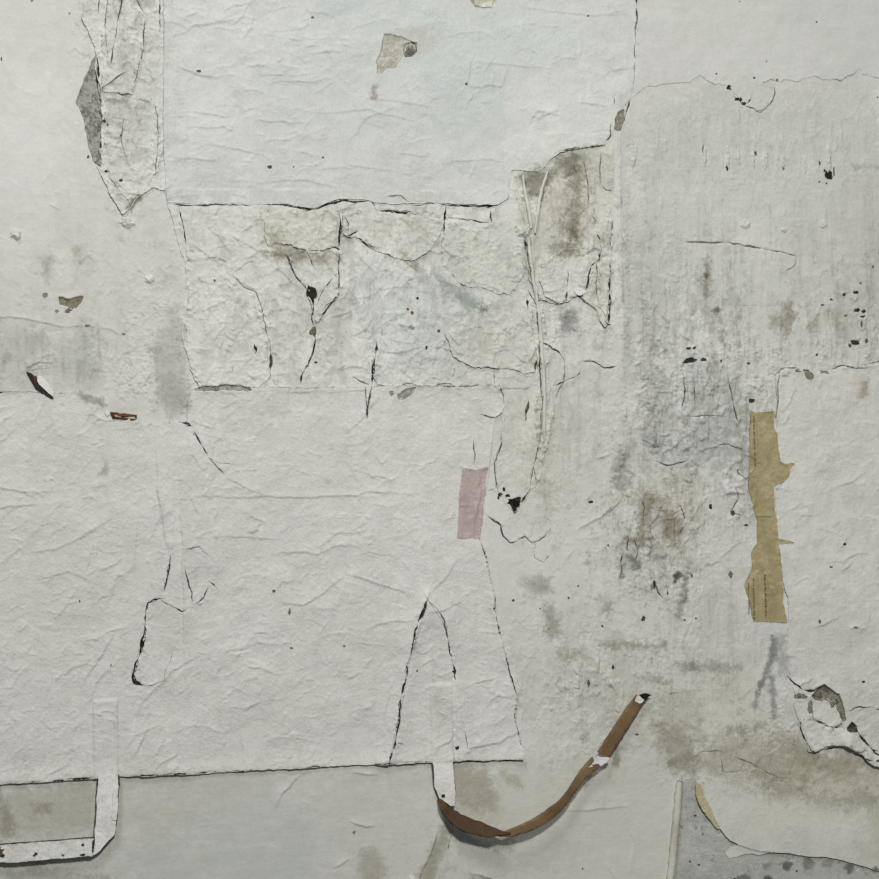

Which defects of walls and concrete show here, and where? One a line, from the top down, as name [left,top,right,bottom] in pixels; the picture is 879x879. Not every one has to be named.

peeling [76,0,173,214]
crack [175,195,509,384]
crack [352,341,378,419]
crack [444,376,504,418]
crack [521,222,615,502]
crack [180,422,230,473]
crack [473,442,502,490]
crack [488,516,549,562]
crack [456,595,523,762]
peeling [794,685,867,752]